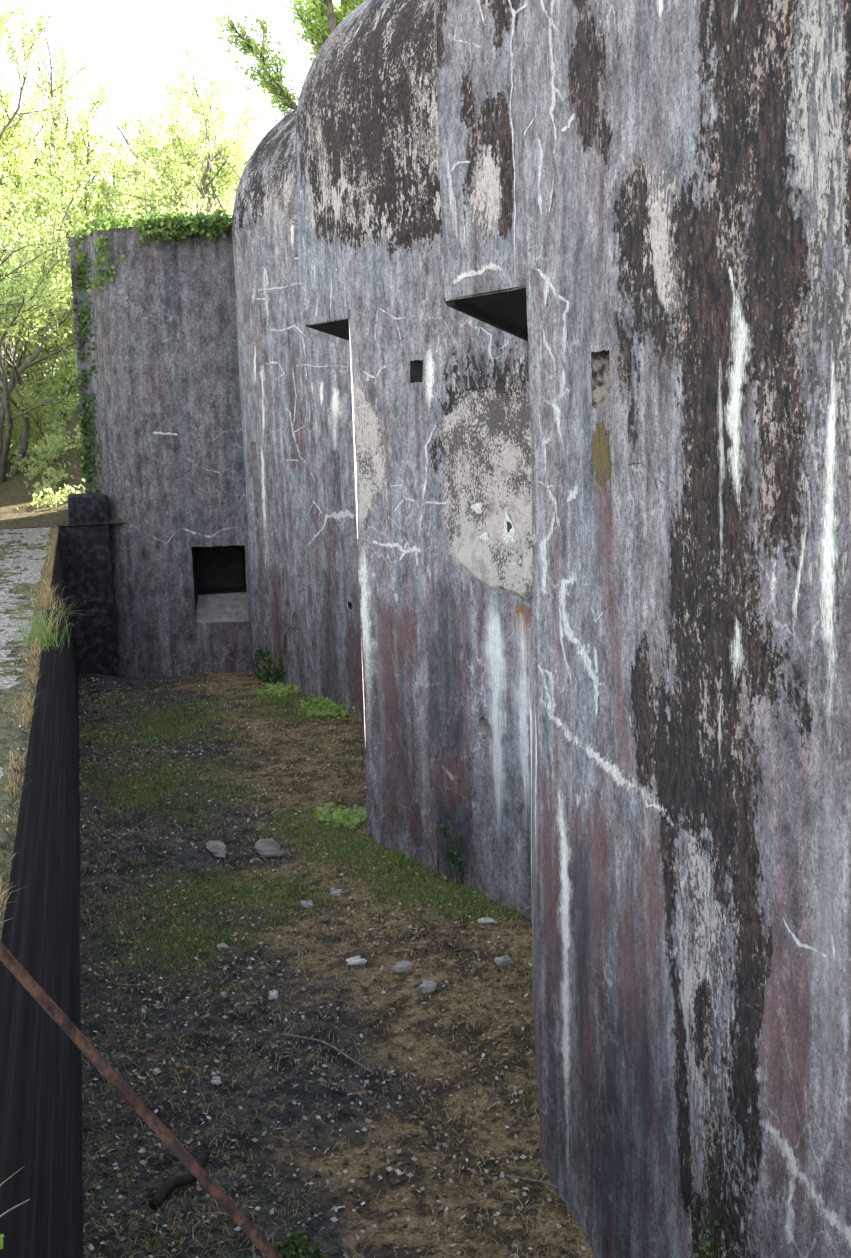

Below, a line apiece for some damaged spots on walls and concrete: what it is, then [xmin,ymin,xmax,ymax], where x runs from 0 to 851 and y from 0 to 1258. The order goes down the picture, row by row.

leakage [232,0,520,259]
leakage [253,348,267,568]
leakage [311,382,344,476]
leakage [425,341,529,490]
crack [452,0,669,822]
leakage [358,548,383,731]
leakage [485,606,552,888]
leakage [568,0,838,1258]
leakage [557,792,587,1167]